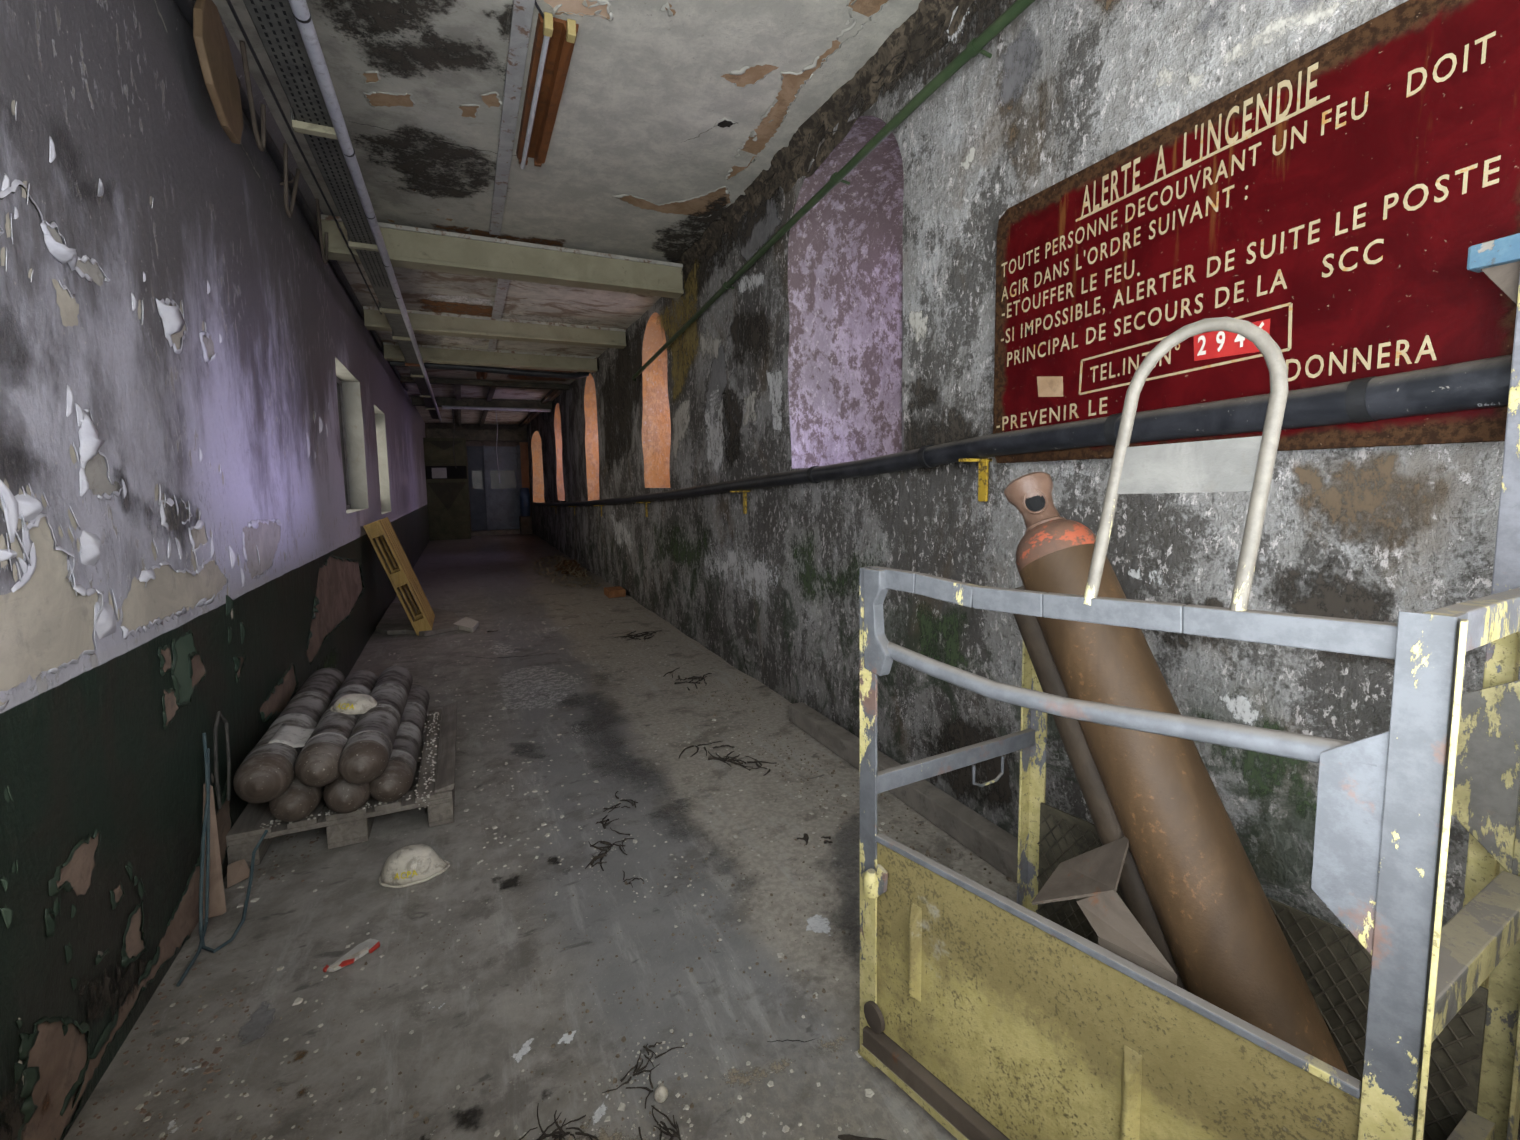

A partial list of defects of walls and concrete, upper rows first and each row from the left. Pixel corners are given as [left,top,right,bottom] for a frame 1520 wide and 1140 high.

mould [318,0,512,81]
flaking render [611,0,986,283]
crack [0,179,44,222]
peeling [40,220,110,327]
peeling [131,272,222,364]
water stain [600,180,785,474]
peeling [0,385,287,730]
water stain [1265,555,1414,622]
water stain [1153,630,1224,650]
water stain [1220,692,1263,726]
water stain [932,753,1017,812]
peeling [14,854,201,1140]